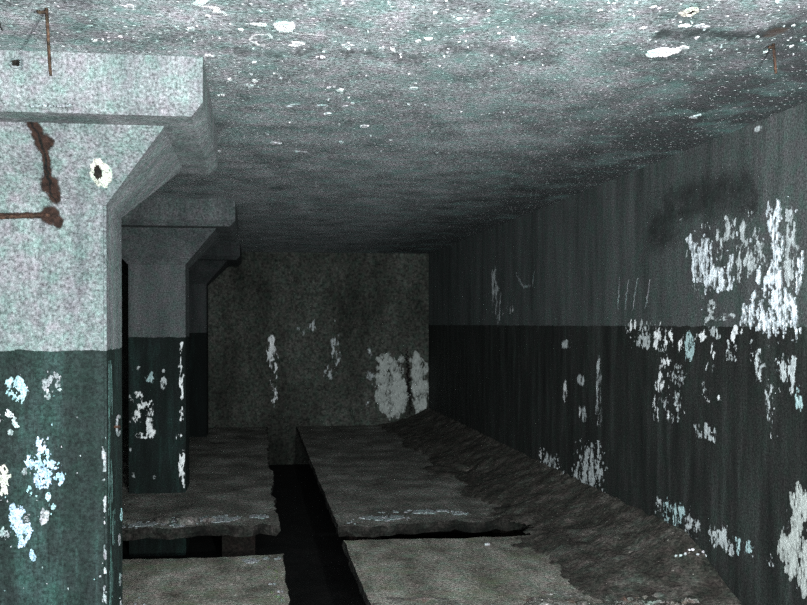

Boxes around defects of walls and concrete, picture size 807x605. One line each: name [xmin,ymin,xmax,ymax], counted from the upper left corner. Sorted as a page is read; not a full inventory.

rust [0,122,64,228]
peeling [627,196,803,422]
peeling [0,409,20,435]
peeling [5,374,29,404]
peeling [42,371,62,400]
peeling [366,348,429,420]
peeling [694,423,715,443]
peeling [0,436,66,561]
peeling [769,481,807,599]